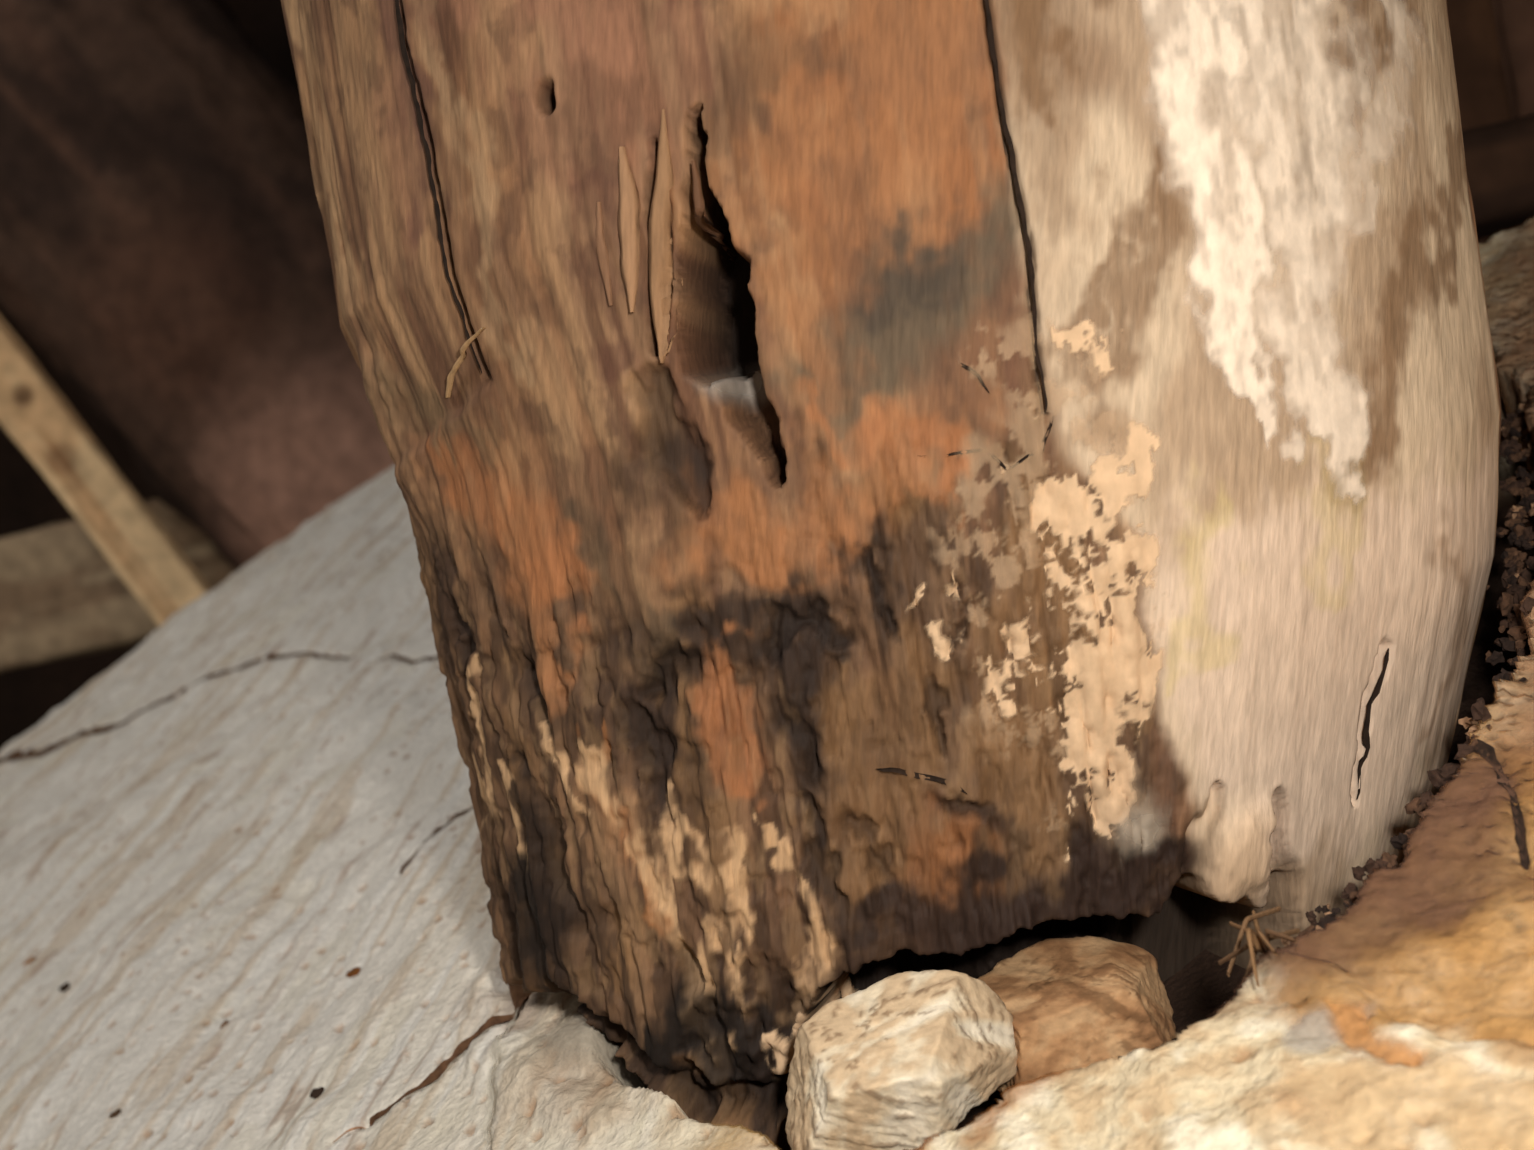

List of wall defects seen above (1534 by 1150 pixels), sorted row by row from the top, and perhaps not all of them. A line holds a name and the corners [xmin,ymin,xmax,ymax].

crack [395,0,482,373]
crack [945,0,1054,470]
peeling [1050,320,1114,375]
peeling [912,584,925,607]
peeling [927,621,962,661]
peeling [947,573,959,596]
peeling [985,421,1163,838]
crack [0,652,438,763]
crack [333,996,527,1143]
peeling [762,972,854,1075]